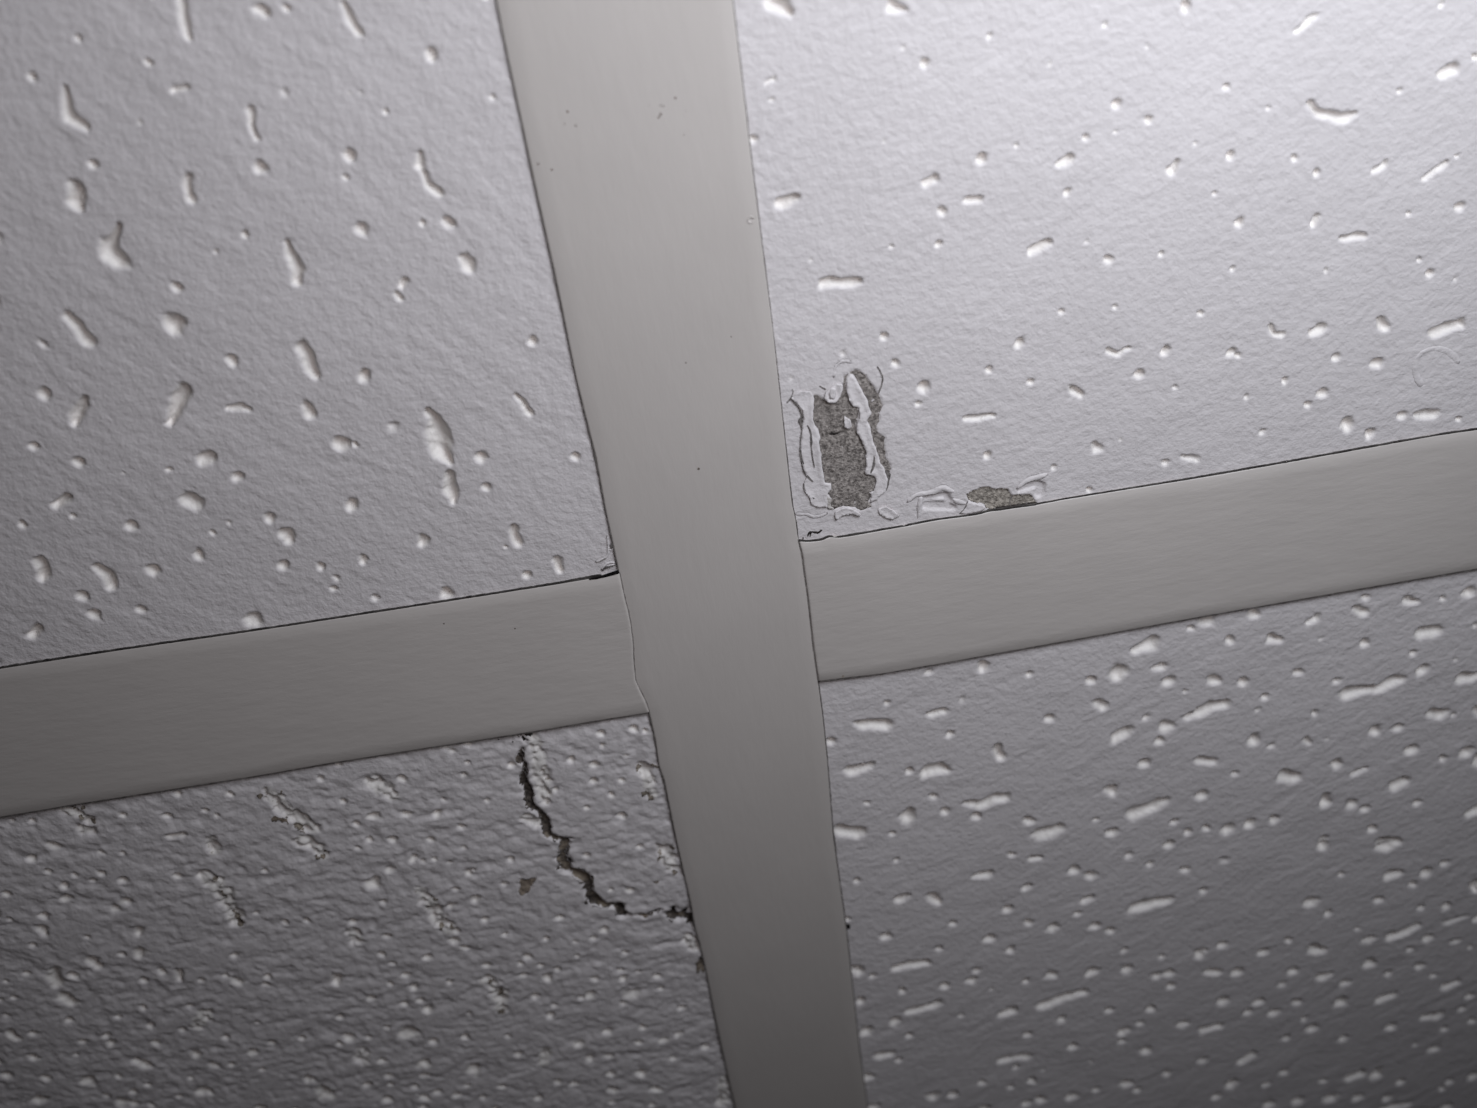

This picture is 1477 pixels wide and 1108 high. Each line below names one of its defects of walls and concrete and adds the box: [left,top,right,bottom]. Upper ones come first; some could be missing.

crack [0,0,735,1108]
peeling [786,359,900,539]
spalling [959,486,1037,514]